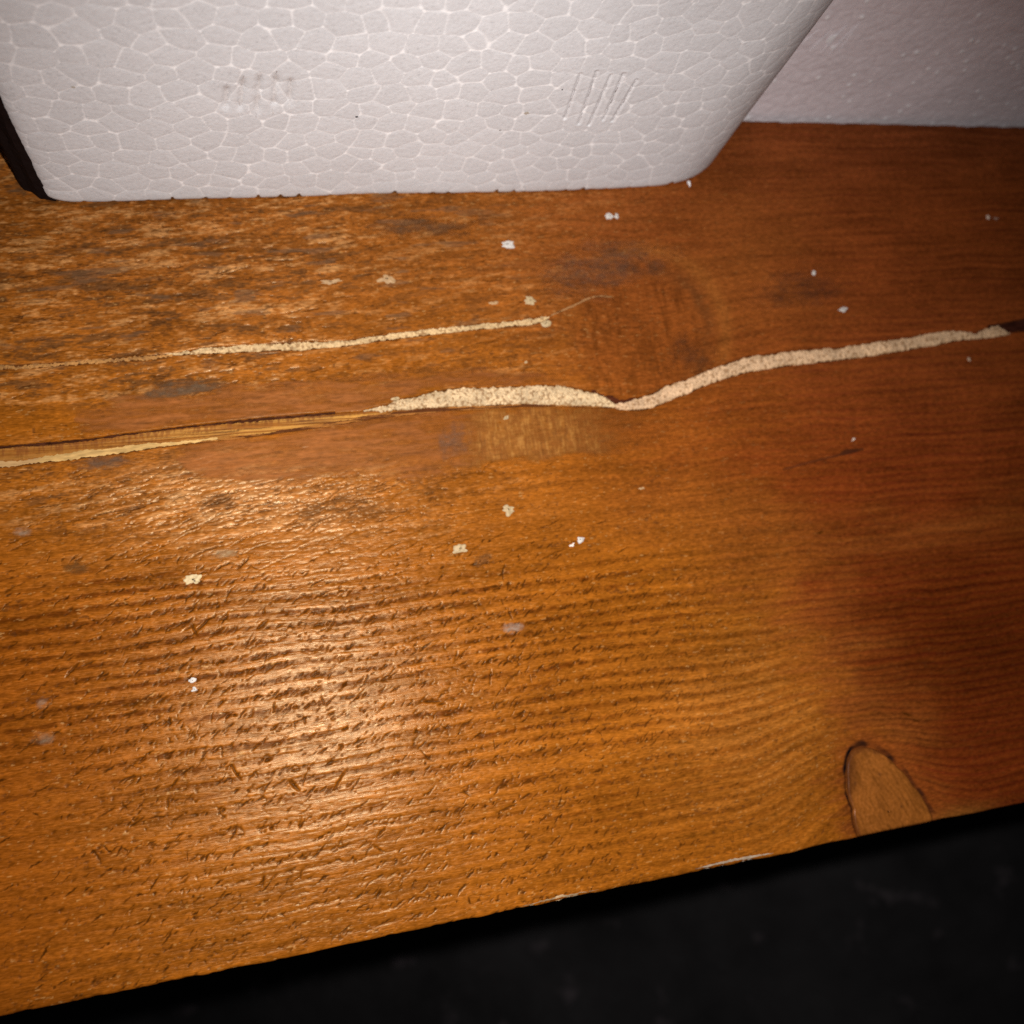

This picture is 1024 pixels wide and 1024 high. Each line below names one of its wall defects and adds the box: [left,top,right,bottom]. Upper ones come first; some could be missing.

crack [0,295,612,370]
crack [0,319,1024,470]